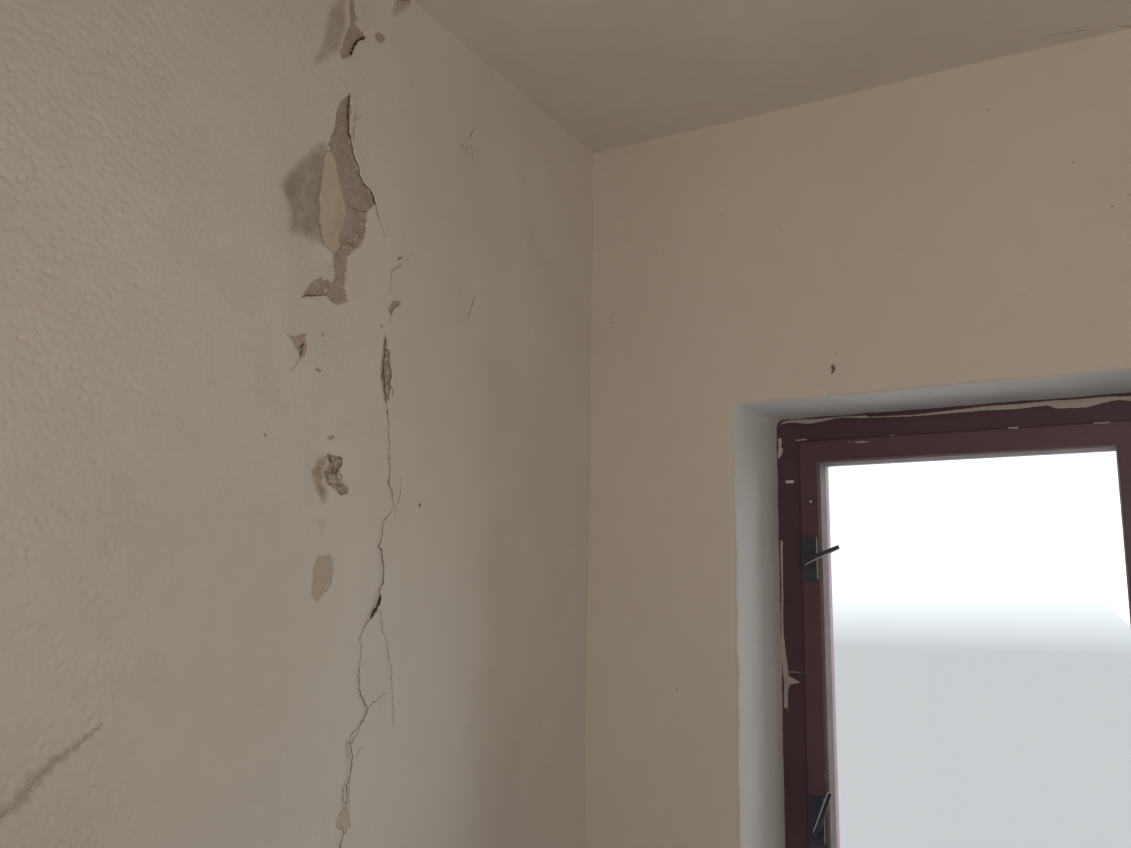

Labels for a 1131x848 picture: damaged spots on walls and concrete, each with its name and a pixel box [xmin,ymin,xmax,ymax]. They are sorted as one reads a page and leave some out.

spalling [340,0,385,59]
spalling [302,97,374,305]
crack [388,258,409,316]
spalling [283,310,308,368]
spalling [381,325,393,404]
spalling [324,454,348,495]
spalling [311,554,334,601]
crack [340,404,401,848]